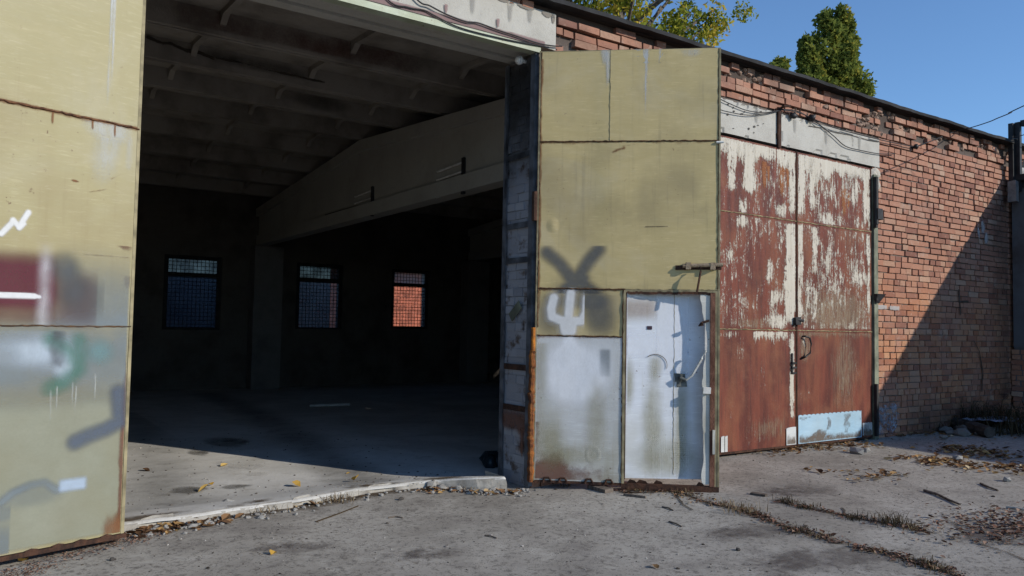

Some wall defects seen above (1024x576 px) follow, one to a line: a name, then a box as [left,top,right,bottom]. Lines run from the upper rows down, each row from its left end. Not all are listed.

corrosion [3,100,138,136]
corrosion [762,161,789,194]
peeling [720,102,909,417]
corrosion [535,457,586,480]